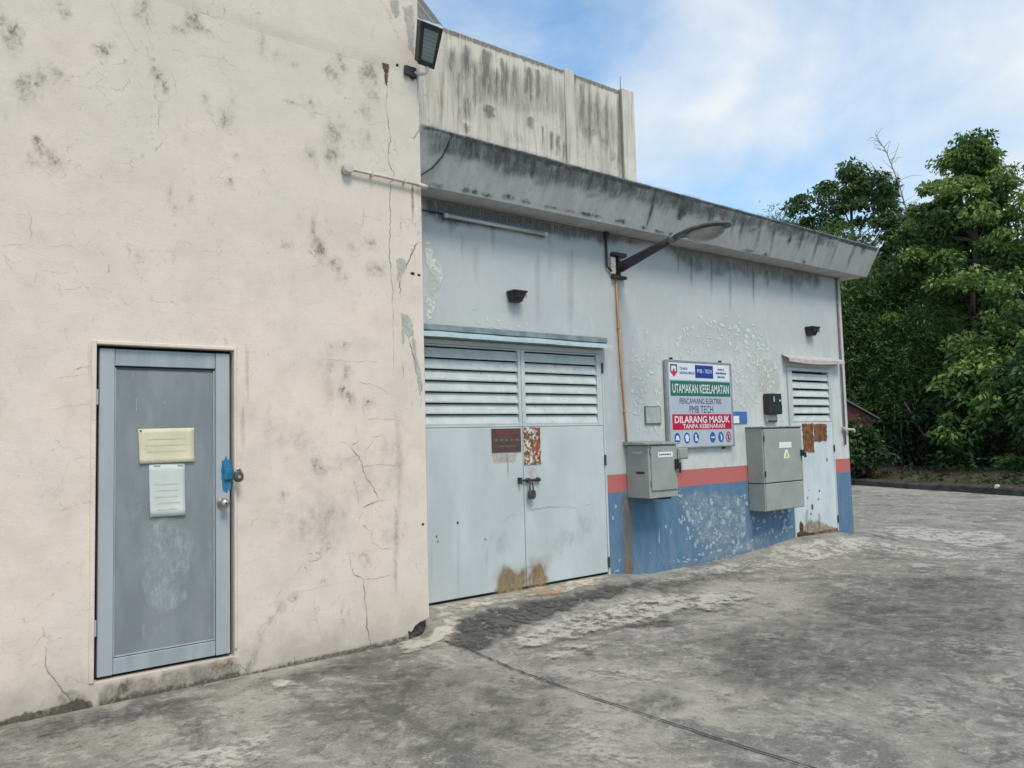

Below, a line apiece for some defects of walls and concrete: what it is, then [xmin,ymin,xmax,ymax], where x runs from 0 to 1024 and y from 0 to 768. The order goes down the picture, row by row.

damp [426,27,877,251]
peeling [397,238,443,321]
peeling [401,314,422,394]
peeling [650,491,793,563]
corrosion [805,521,837,535]
corrosion [497,564,559,595]
damp [449,573,752,684]